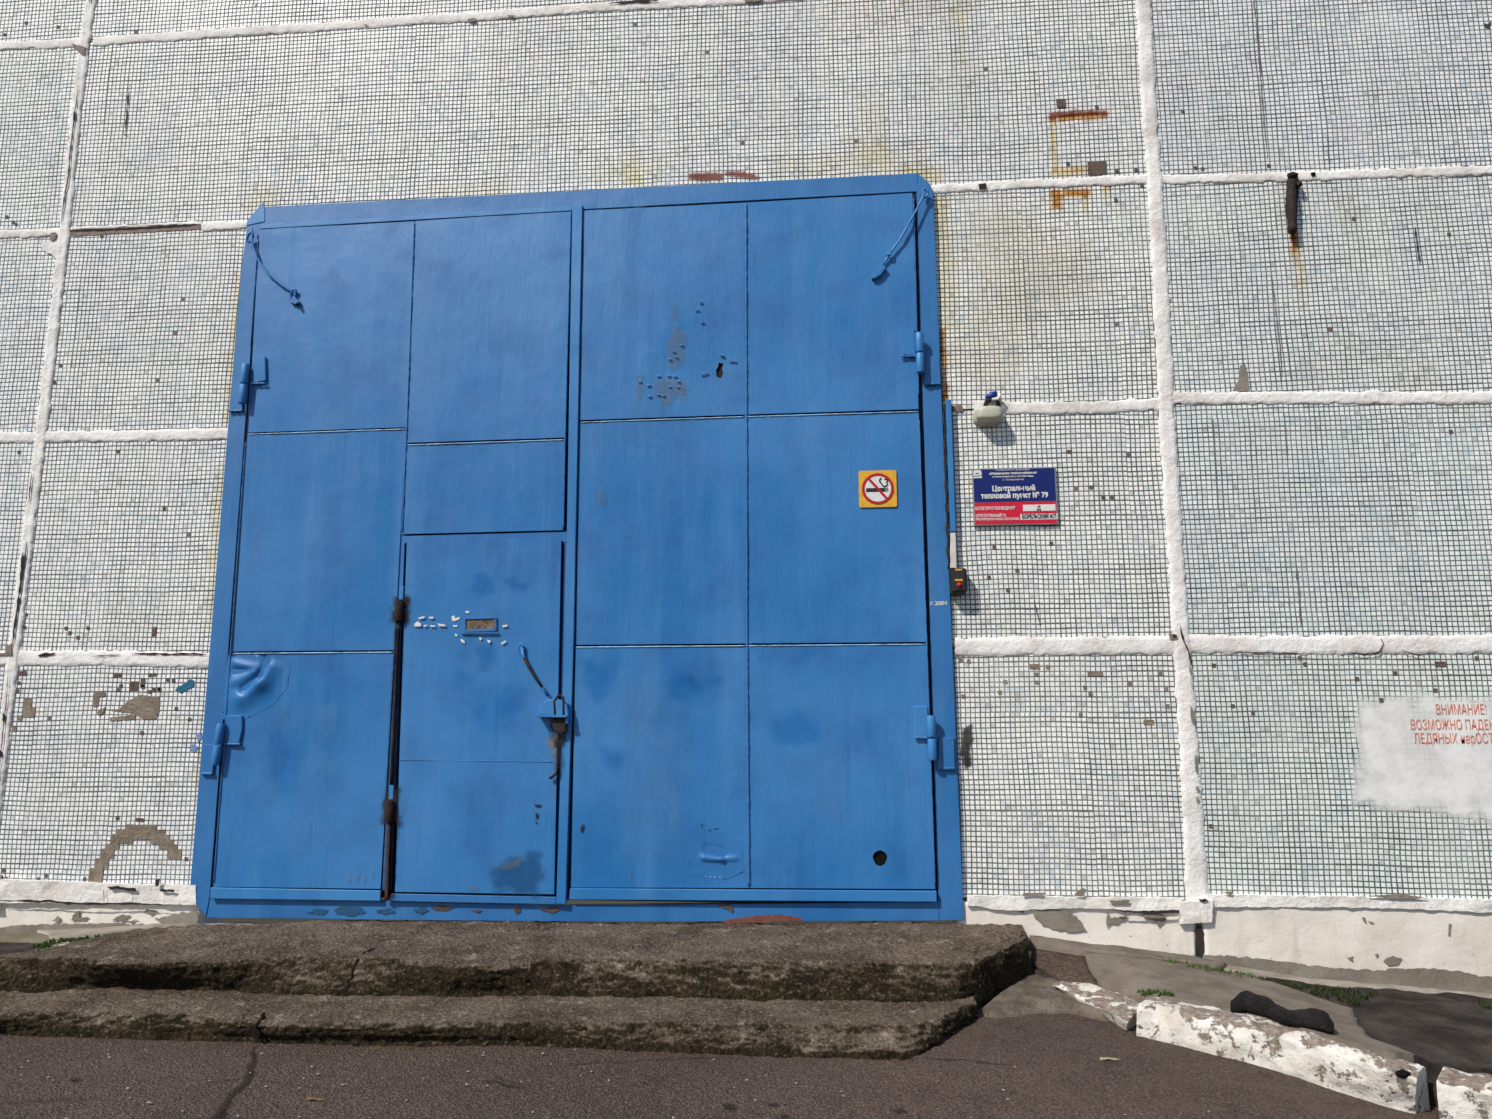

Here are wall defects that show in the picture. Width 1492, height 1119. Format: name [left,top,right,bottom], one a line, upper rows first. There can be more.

rust [1049,109,1105,119]
spalling [83,816,188,883]
rust [383,850,394,897]